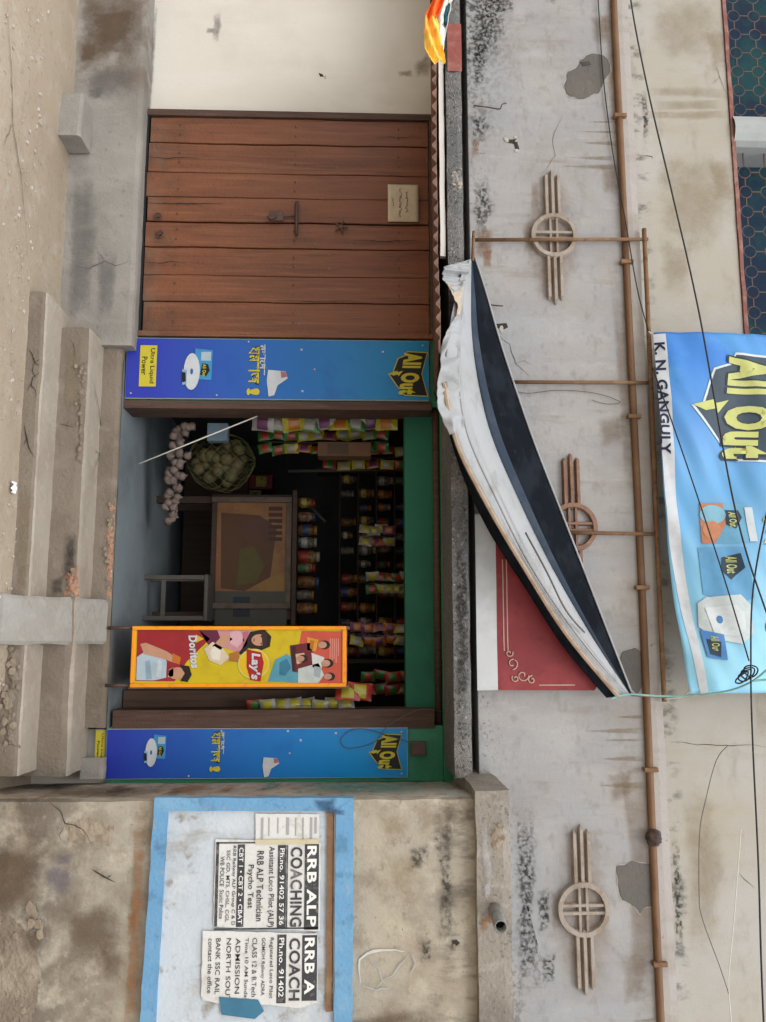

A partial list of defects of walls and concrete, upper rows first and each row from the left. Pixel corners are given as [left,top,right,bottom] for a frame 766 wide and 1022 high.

water stain [474,0,508,81]
water stain [474,189,491,224]
water stain [520,837,554,976]